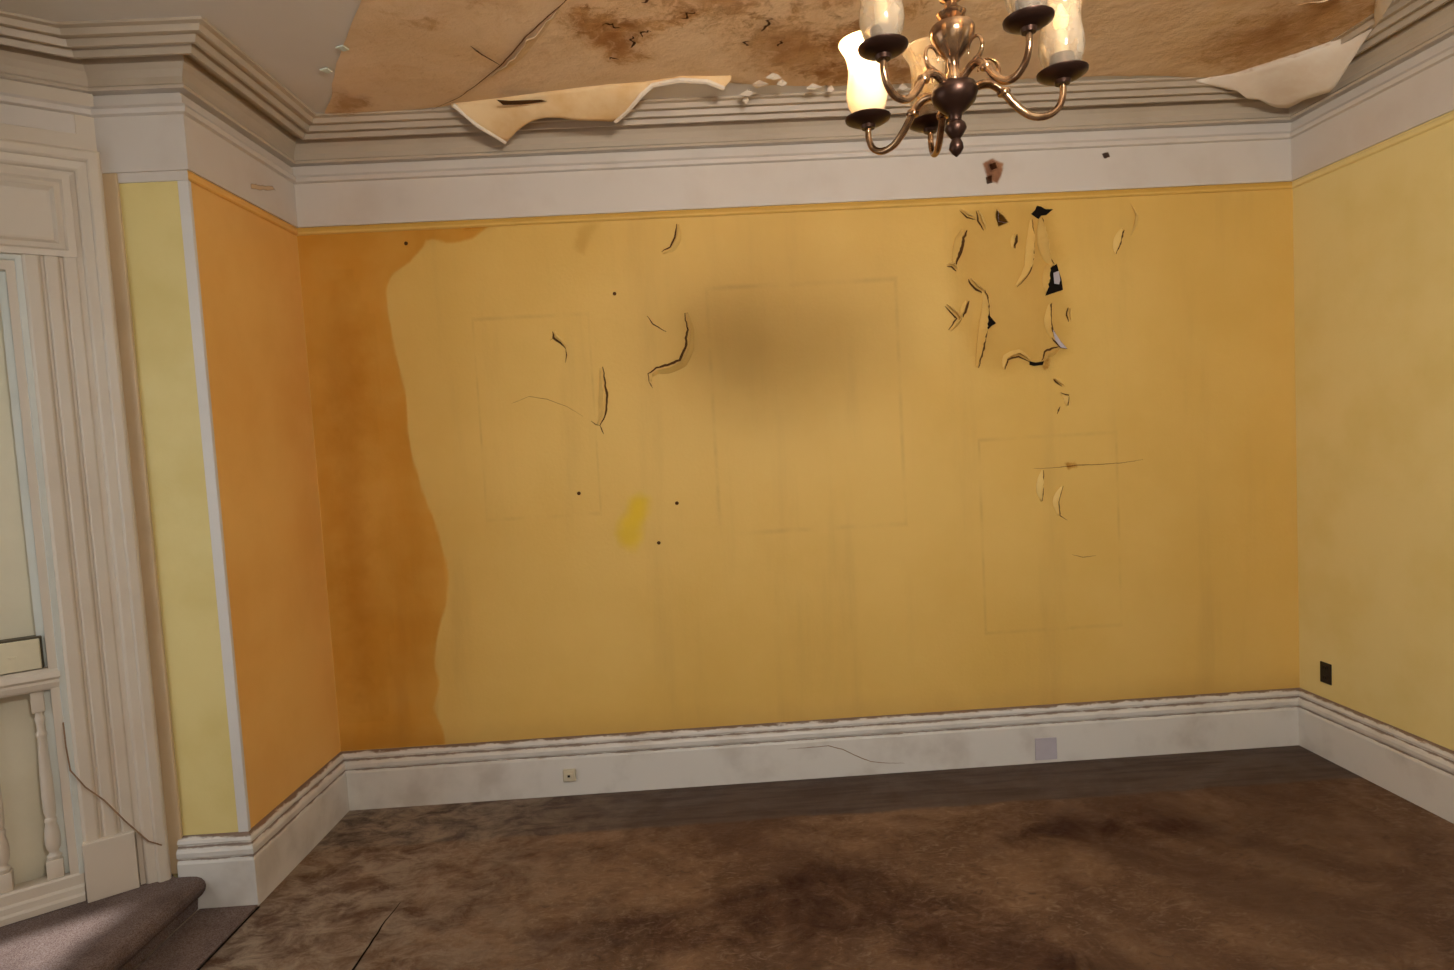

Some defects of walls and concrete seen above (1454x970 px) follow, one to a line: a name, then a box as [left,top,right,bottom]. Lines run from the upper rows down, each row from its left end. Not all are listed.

peeling [945,206,1071,414]